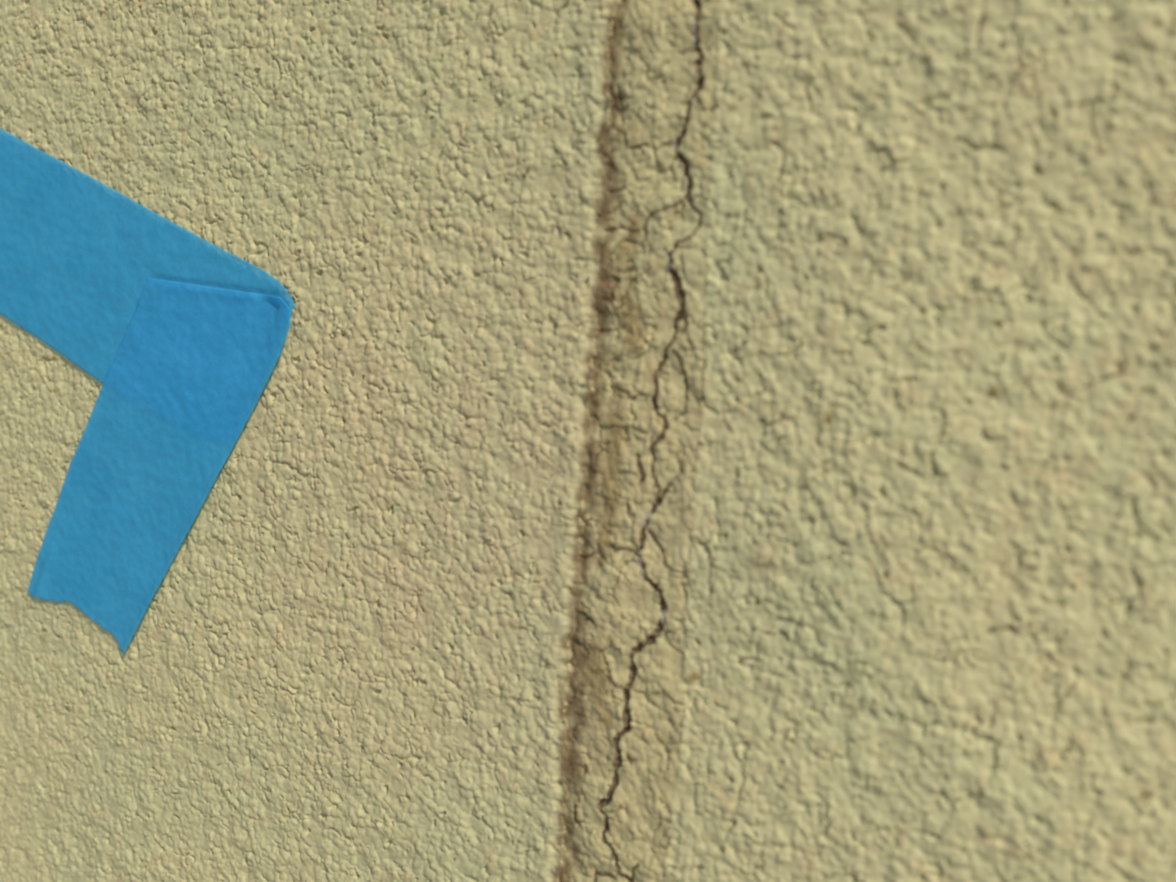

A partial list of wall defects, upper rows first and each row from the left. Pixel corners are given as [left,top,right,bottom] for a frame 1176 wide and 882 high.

crack [575,0,704,882]
crack [704,541,712,614]